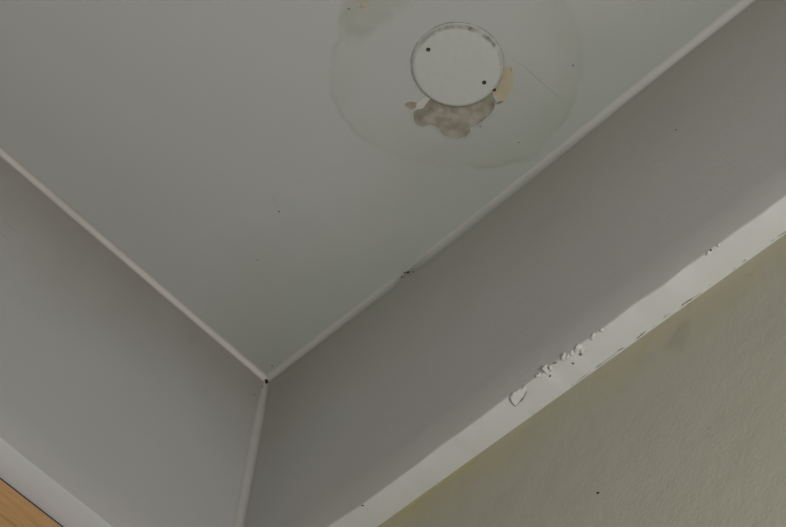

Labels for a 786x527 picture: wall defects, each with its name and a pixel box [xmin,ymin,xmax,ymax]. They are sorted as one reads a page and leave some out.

peeling [402,63,517,141]